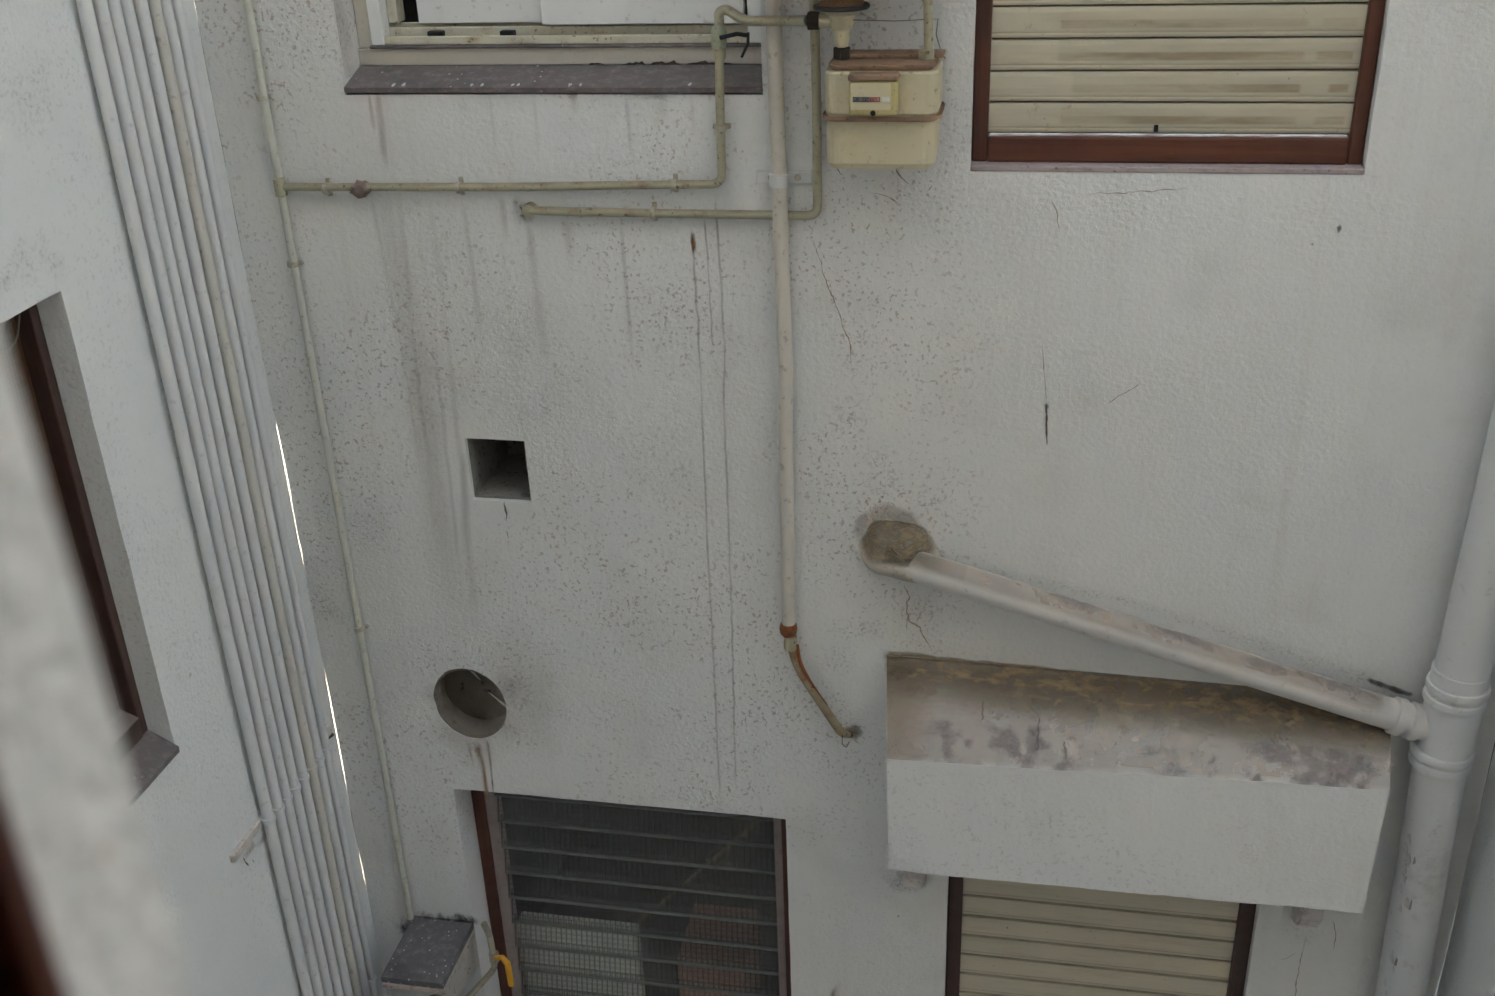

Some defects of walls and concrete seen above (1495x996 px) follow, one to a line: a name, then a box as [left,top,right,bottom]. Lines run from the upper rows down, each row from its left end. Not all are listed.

crack [814,244,853,371]
leakage [886,652,1391,789]
leakage [1318,677,1412,695]